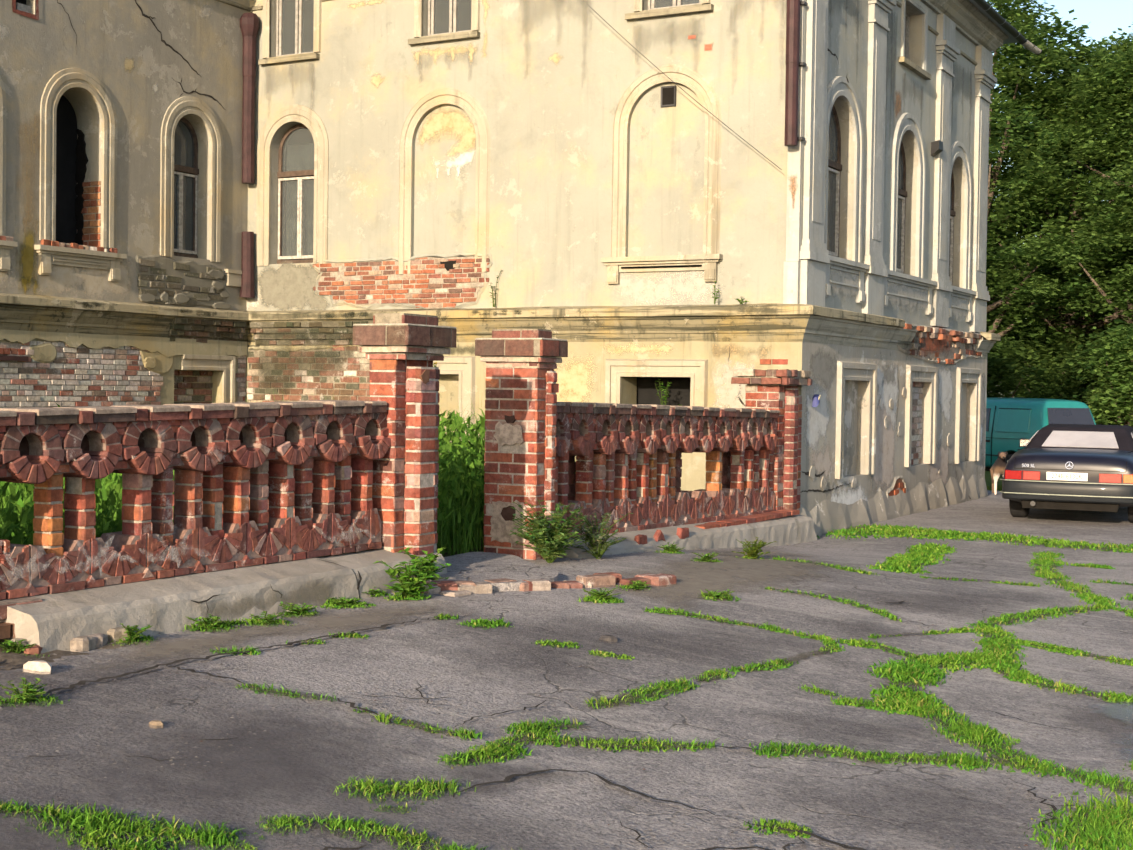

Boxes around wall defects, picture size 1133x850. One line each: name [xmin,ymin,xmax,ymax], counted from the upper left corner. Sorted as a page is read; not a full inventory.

crack [135,0,223,107]
leakage [19,115,40,292]
peeling [420,111,476,178]
flaking render [0,253,493,408]
flaking render [805,352,907,505]
flaking render [891,297,983,484]
crack [191,595,218,617]
crack [319,559,362,593]